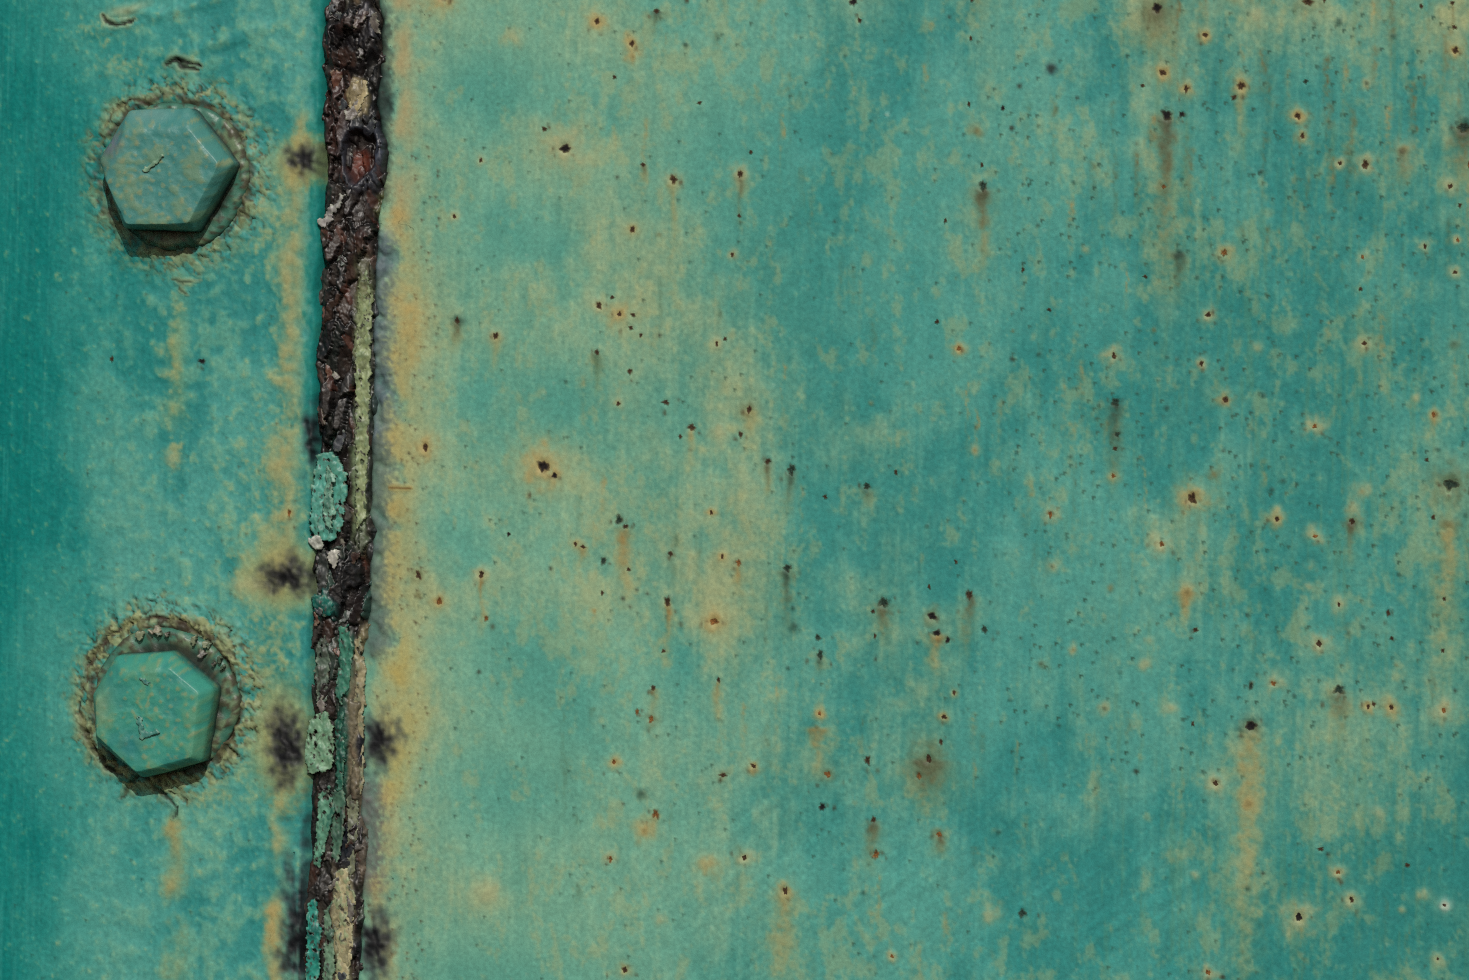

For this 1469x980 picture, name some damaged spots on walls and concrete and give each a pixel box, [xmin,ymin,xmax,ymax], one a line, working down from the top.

rust [1226,69,1261,156]
peeling [68,59,282,289]
rust [1128,0,1239,326]
rust [967,178,998,270]
rust [504,429,579,502]
rust [1147,465,1226,562]
rust [1173,577,1201,624]
rust [1192,665,1368,980]